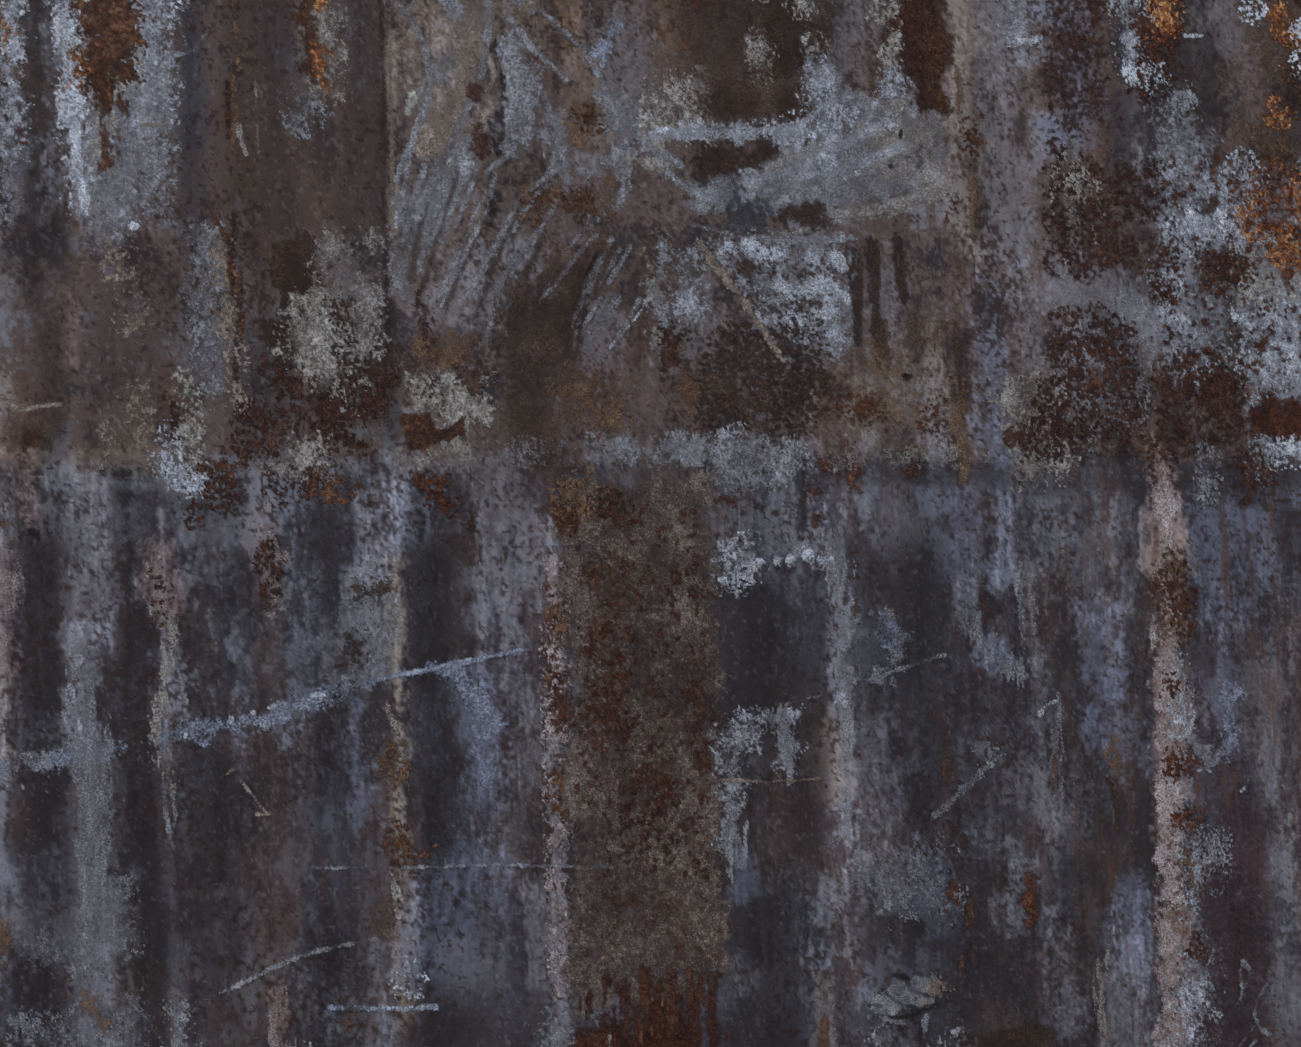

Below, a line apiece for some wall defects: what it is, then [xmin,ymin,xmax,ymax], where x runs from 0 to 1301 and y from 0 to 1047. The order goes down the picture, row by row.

corrosion [0,0,34,202]
corrosion [61,0,154,177]
corrosion [284,0,332,95]
corrosion [516,172,653,229]
corrosion [647,0,843,236]
corrosion [880,0,987,234]
corrosion [1003,0,1301,505]
corrosion [172,230,497,533]
corrosion [147,544,175,628]
corrosion [252,526,291,615]
corrosion [539,465,734,1047]
corrosion [268,986,296,1047]